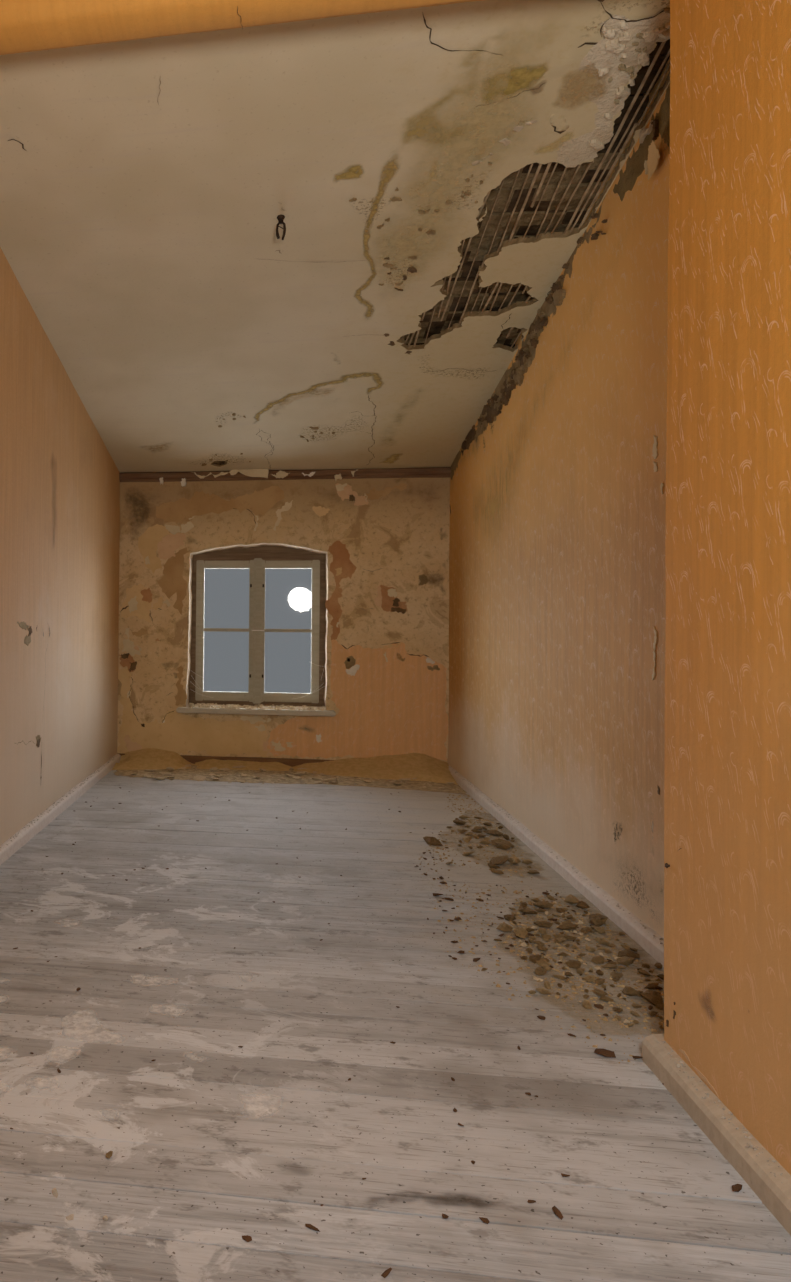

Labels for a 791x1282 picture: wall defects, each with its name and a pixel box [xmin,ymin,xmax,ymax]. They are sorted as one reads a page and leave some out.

damp [336,166,363,180]
damp [390,66,546,262]
damp [355,160,397,317]
flaking render [379,0,670,480]
damp [254,373,382,421]
flaking render [374,585,407,614]
flaking render [344,656,360,676]